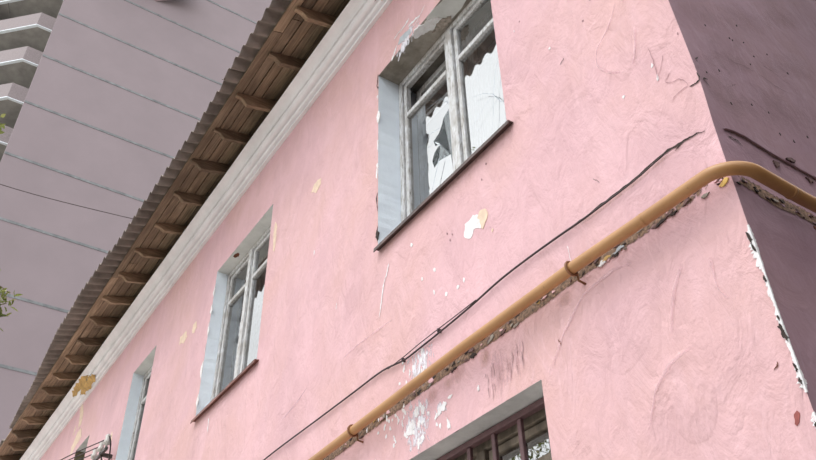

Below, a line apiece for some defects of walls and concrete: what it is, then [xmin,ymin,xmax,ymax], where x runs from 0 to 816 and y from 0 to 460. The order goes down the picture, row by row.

flaking render [391,0,466,61]
flaking render [323,176,816,460]
flaking render [70,374,95,455]